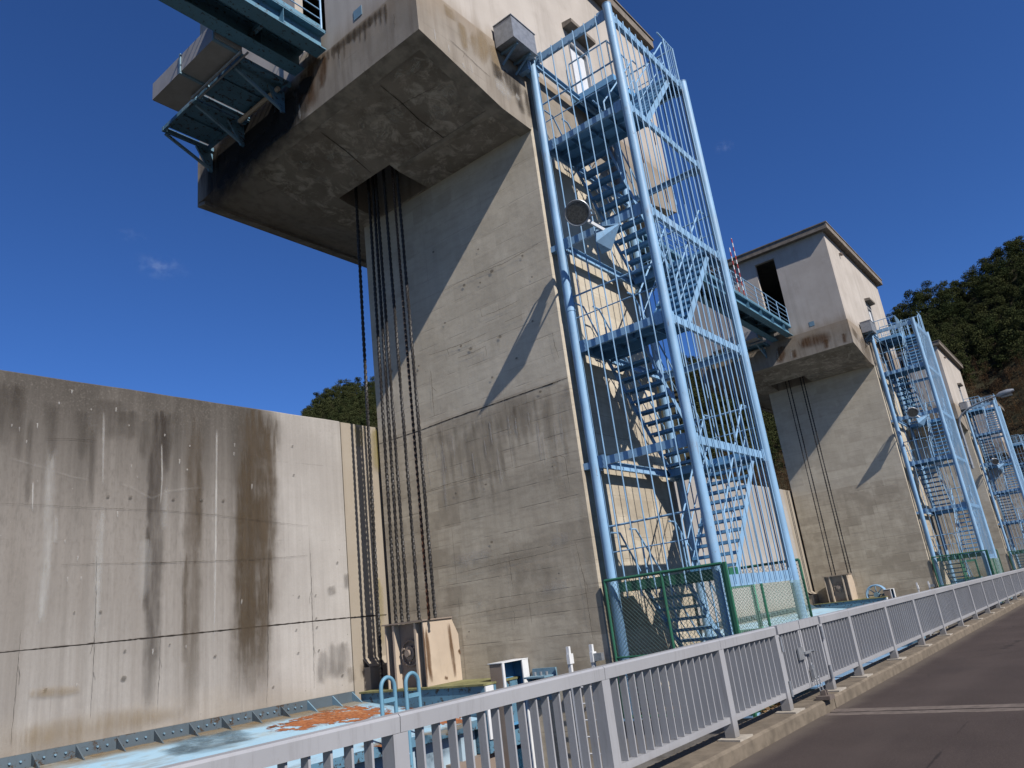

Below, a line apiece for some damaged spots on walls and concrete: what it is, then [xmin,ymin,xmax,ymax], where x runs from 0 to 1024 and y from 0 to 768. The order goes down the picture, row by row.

damp [334,5,387,52]
corrosion [778,335,828,361]
damp [236,410,276,645]
corrosion [163,705,413,741]